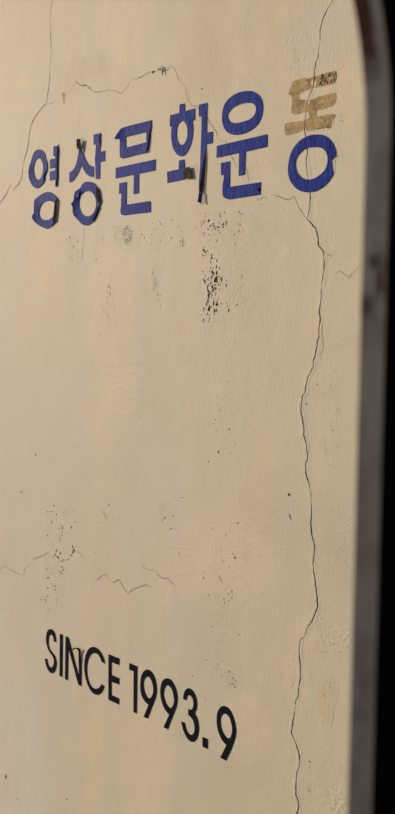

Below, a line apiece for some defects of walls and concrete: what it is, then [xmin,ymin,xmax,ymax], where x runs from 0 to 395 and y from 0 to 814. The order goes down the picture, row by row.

crack [257,0,355,814]